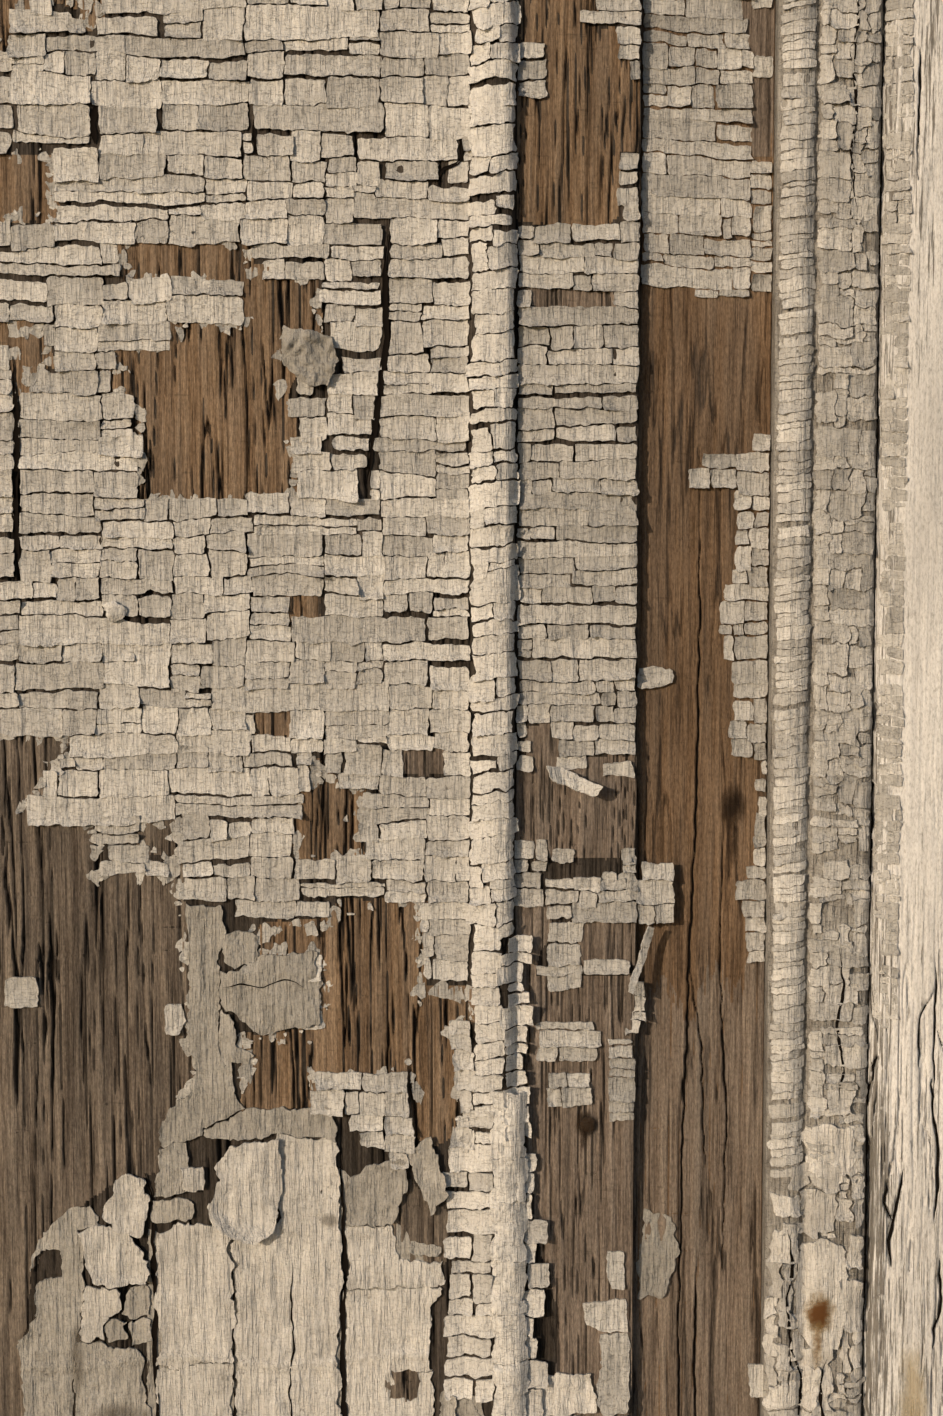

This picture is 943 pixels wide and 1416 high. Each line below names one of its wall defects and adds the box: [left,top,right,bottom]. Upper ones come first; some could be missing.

crack [367,234,420,481]
peeling [768,0,914,1101]
peeling [0,0,638,1416]
peeling [290,0,774,1416]
crack [835,0,943,1416]
peeling [762,860,871,1416]
crack [145,1174,159,1416]
crack [230,1270,238,1416]
crack [287,1260,295,1416]
crack [786,1230,827,1416]
rust [806,1298,831,1358]